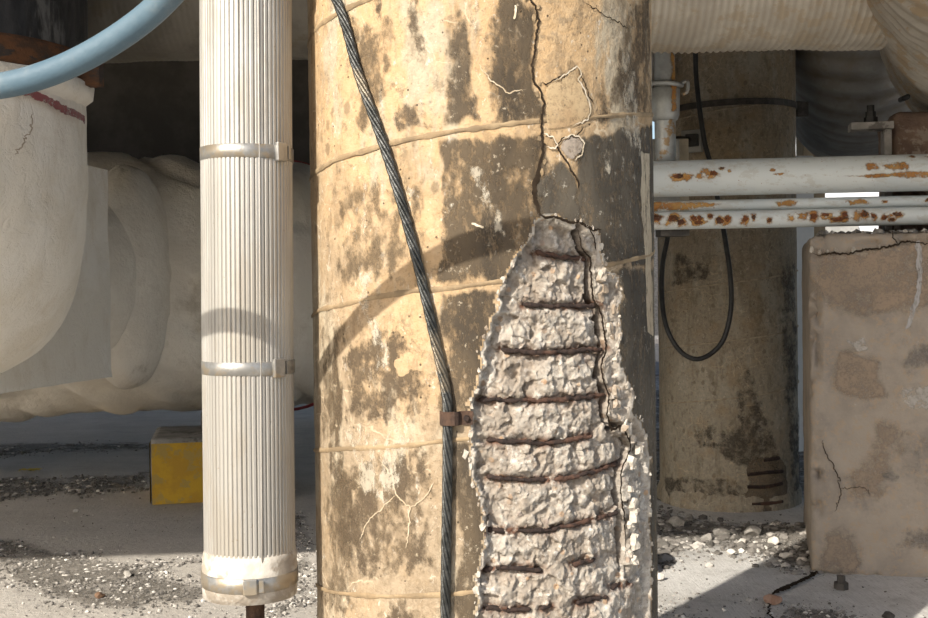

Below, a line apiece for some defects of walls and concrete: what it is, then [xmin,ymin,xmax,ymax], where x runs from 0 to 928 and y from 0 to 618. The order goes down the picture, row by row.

leakage [351,0,389,102]
leakage [408,0,424,50]
leakage [395,104,425,130]
leakage [337,184,405,308]
crack [479,0,631,554]
leakage [437,0,739,618]
crack [809,231,928,257]
spalling [462,211,654,618]
leakage [322,322,432,613]
spalling [745,455,788,512]
crack [822,440,869,511]
crack [750,571,818,618]